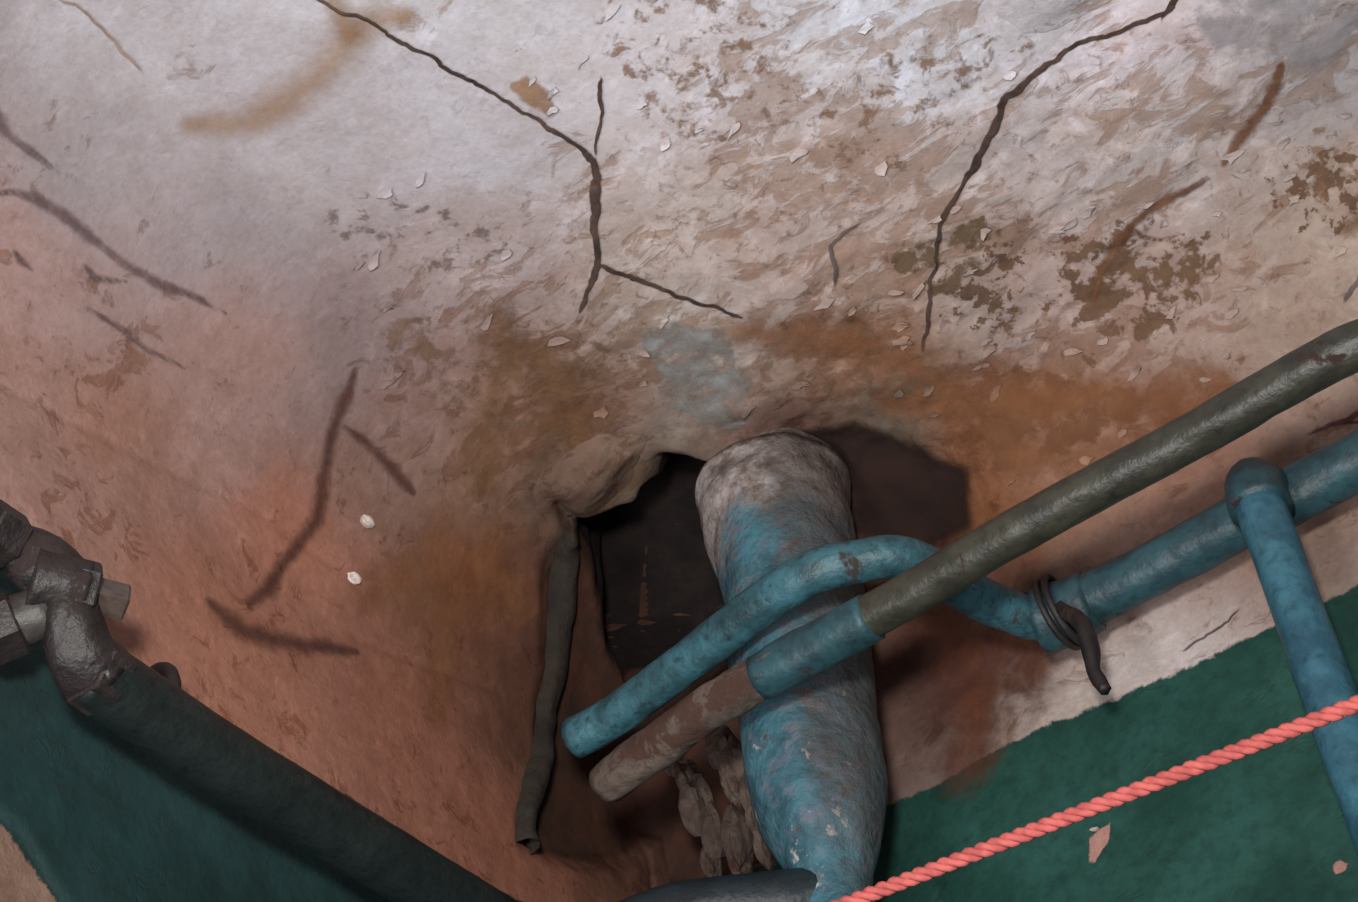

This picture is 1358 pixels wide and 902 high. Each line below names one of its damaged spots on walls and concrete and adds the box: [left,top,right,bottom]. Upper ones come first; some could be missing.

peeling [511,77,559,115]
peeling [607,42,820,151]
peeling [690,0,769,73]
peeling [859,52,936,128]
peeling [954,35,995,88]
crack [317,0,742,319]
crack [921,0,1178,351]
crack [1091,62,1284,301]
peeling [1264,120,1358,258]
crack [1344,277,1358,301]
spalling [515,452,729,881]
peeling [0,824,56,902]